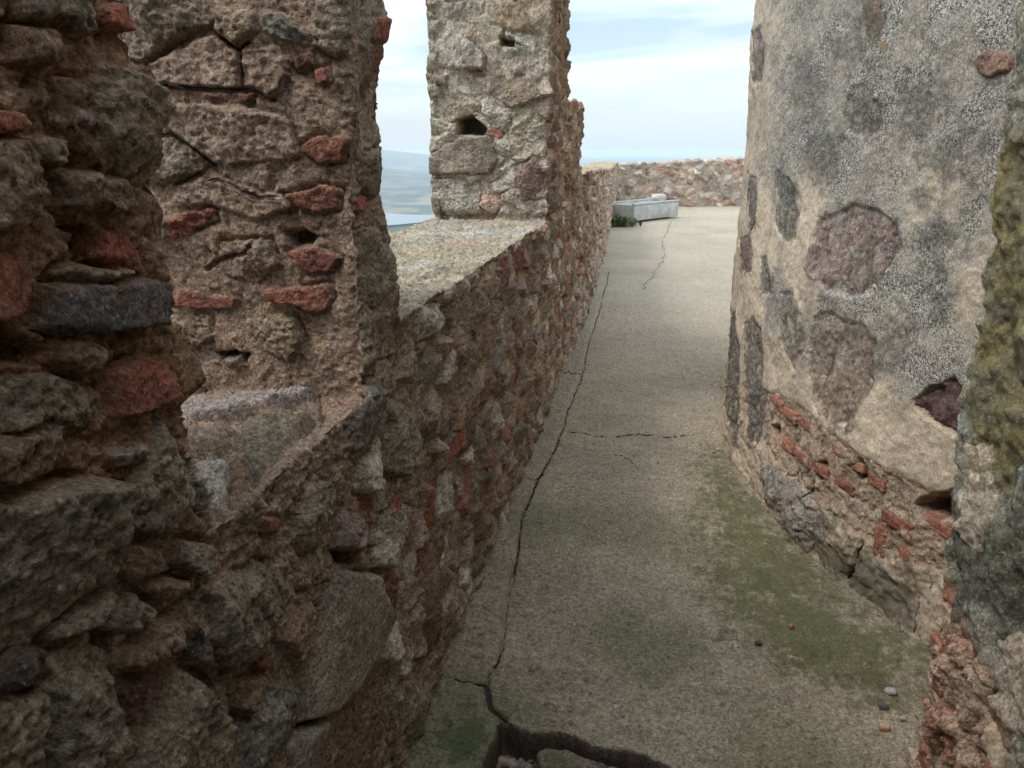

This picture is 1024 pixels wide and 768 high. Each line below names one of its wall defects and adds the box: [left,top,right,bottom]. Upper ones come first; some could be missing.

crack [643,221,672,289]
crack [454,273,697,723]